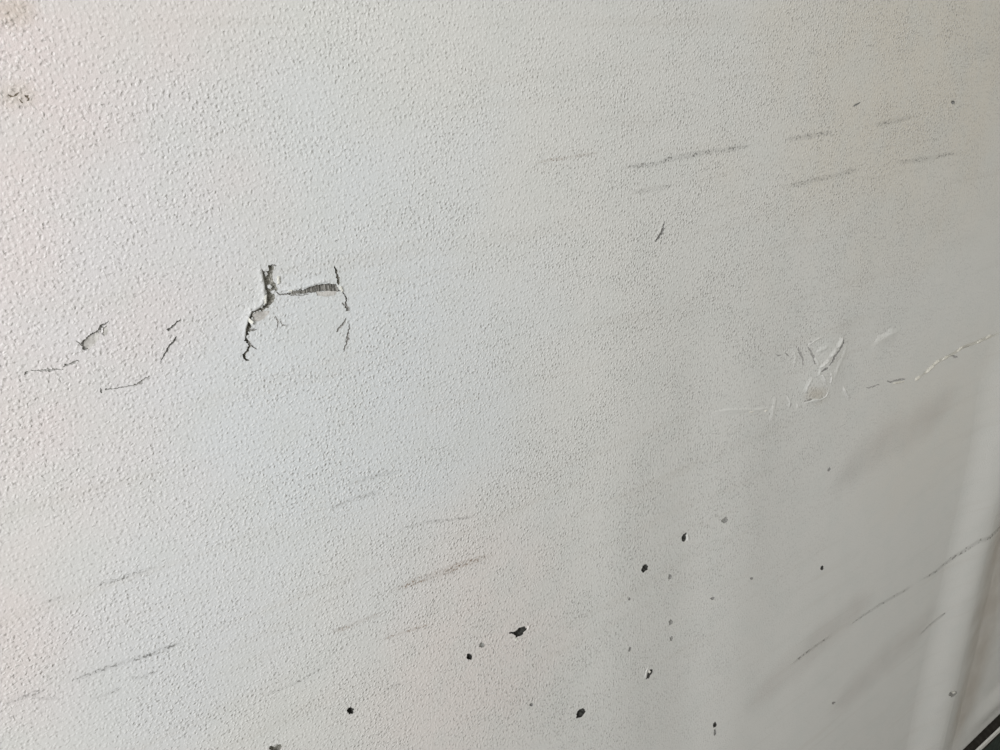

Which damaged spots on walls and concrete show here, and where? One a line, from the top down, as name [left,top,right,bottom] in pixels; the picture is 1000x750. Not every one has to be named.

crack [238,262,350,361]
crack [24,360,79,375]
crack [100,319,181,393]
flaking render [509,625,530,641]